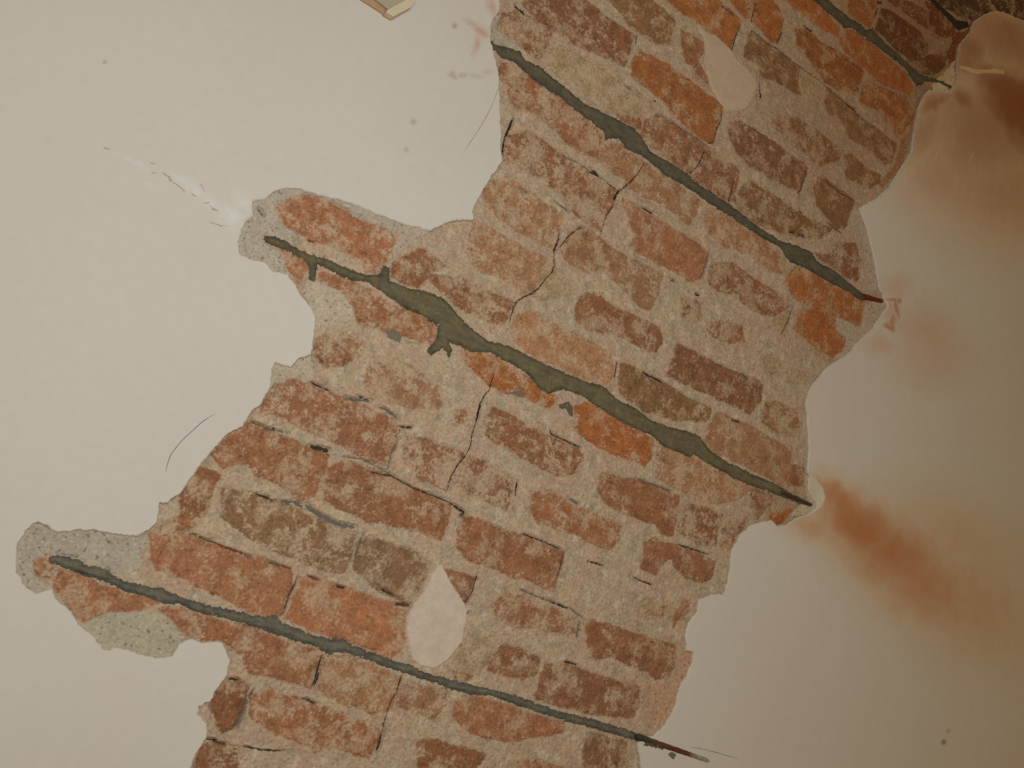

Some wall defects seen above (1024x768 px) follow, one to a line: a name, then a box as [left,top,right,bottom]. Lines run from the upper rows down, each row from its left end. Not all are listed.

flaking render [829,0,1024,93]
crack [447,370,495,489]
flaking render [181,0,937,738]
crack [509,164,644,322]
flaking render [15,455,642,768]
rust [763,452,1024,714]